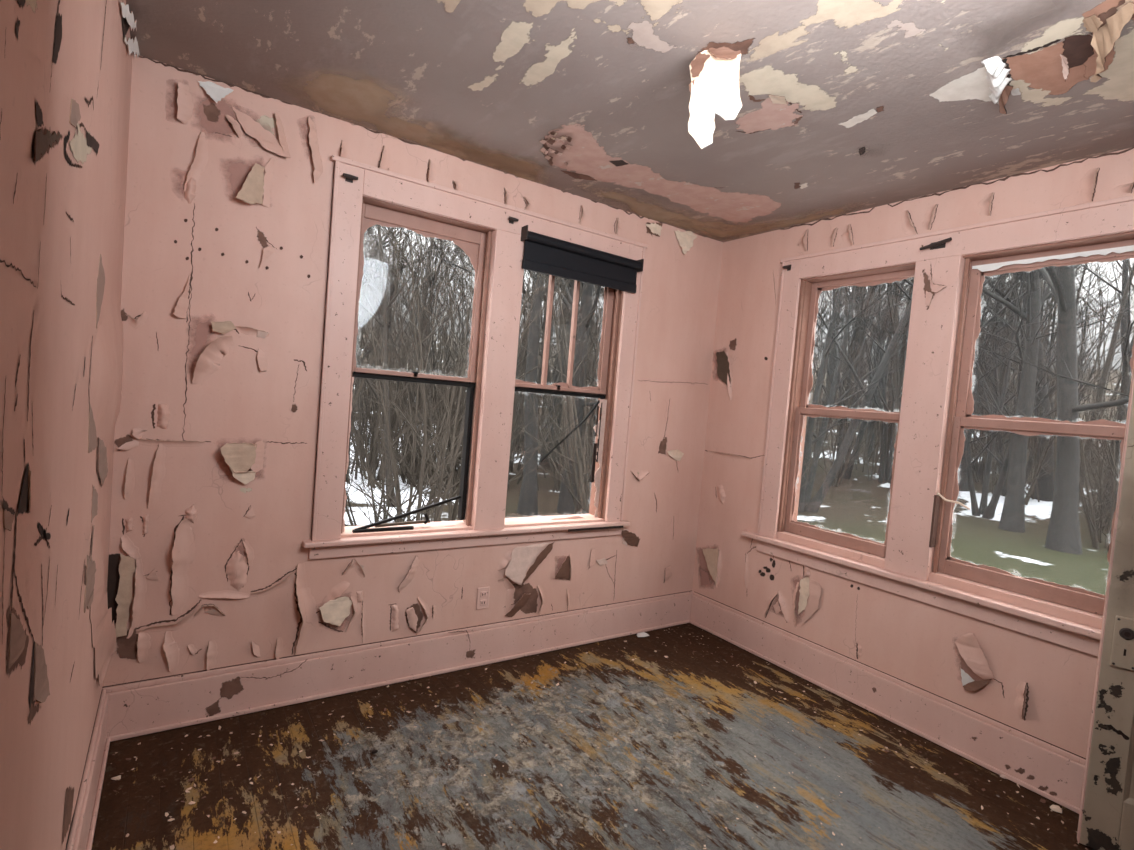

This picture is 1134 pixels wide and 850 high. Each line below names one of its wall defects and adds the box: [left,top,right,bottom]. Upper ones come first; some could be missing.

crack [50,0,62,87]
crack [44,175,74,255]
peeling [32,96,99,168]
peeling [170,81,291,207]
damp [305,74,536,180]
peeling [539,123,781,223]
peeling [688,0,925,149]
peeling [929,0,1134,114]
crack [0,241,75,646]
peeling [79,405,249,686]
peeling [496,541,574,617]
peeling [6,566,50,724]